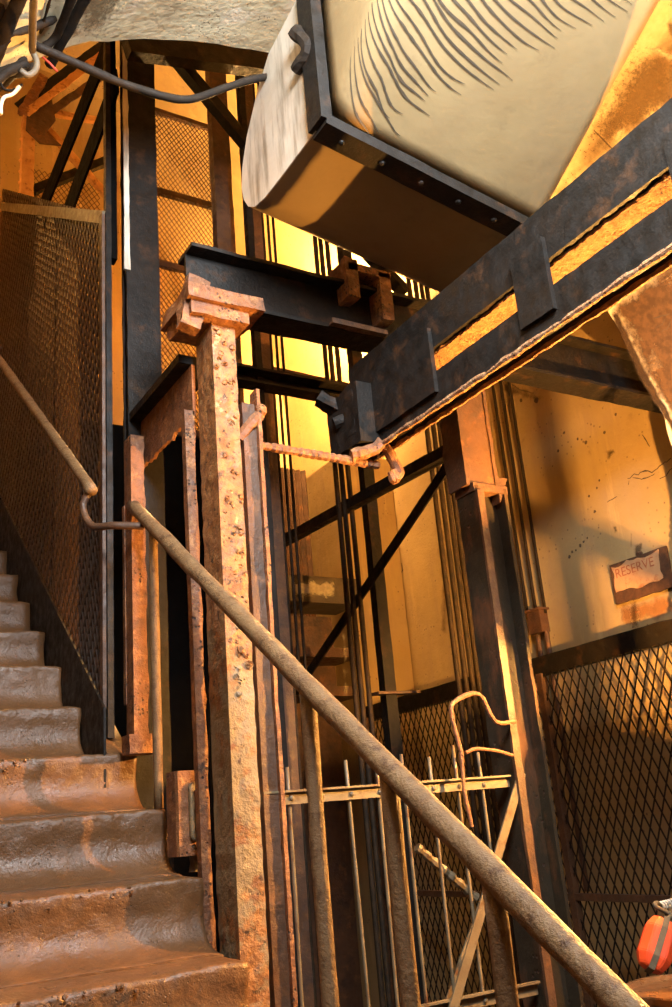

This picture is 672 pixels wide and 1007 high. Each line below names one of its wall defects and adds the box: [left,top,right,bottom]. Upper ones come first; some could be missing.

crack [608,435,672,502]